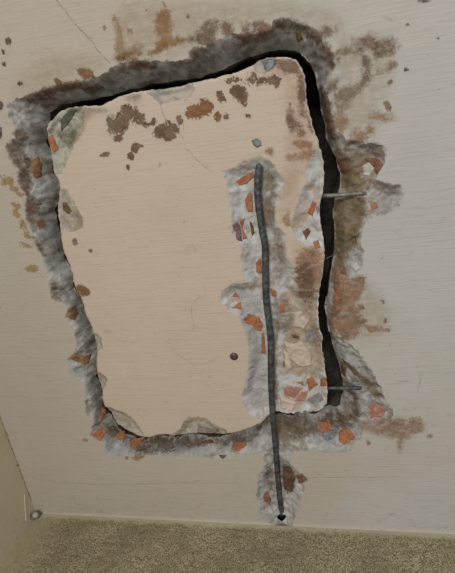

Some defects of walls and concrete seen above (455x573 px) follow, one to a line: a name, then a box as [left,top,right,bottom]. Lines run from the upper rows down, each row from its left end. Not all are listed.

rust [112,2,184,63]
leakage [186,21,274,62]
leakage [336,36,393,62]
leakage [276,58,306,116]
leakage [327,56,370,110]
leakage [286,103,313,137]
spalling [5,17,404,526]
rust [330,269,390,339]
rust [365,419,420,447]